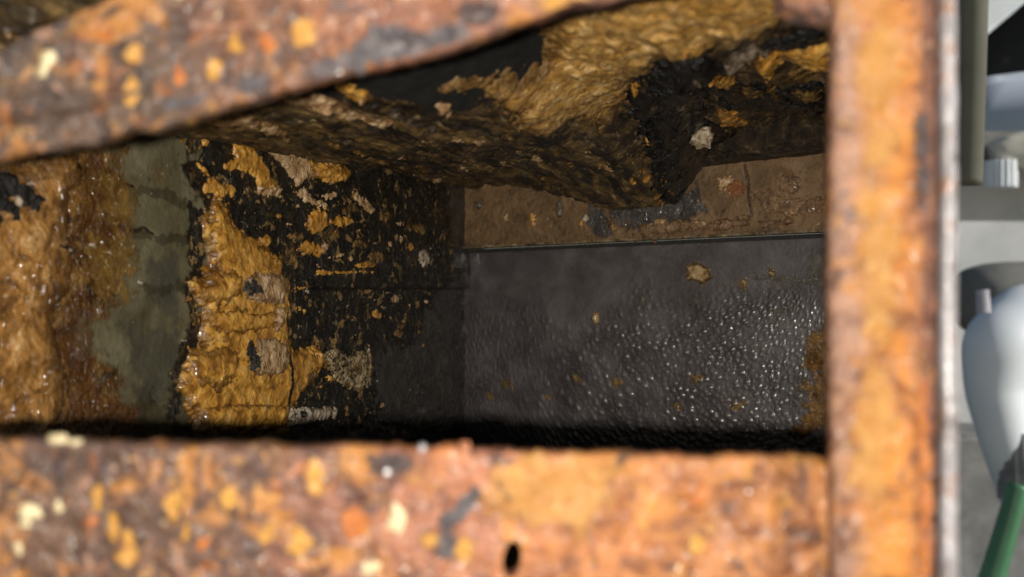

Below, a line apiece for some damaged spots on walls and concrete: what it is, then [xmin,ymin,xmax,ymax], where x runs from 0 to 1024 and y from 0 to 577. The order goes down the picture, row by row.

corrosion [123,43,142,62]
corrosion [291,18,316,47]
spalling [284,2,500,134]
peeling [195,113,470,275]
peeling [629,168,674,207]
spalling [749,169,824,219]
corrosion [48,143,142,439]
peeling [296,298,333,388]
peeling [372,291,410,338]
corrosion [84,484,138,567]
corrosion [491,453,617,535]
corrosion [916,380,934,577]